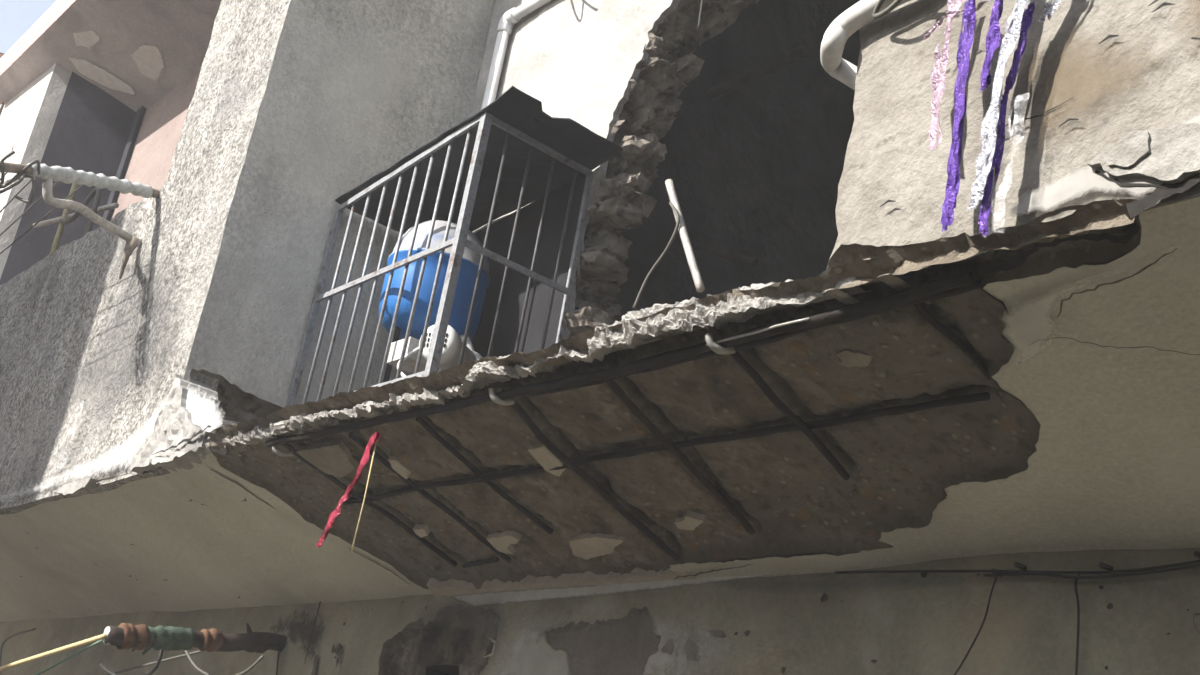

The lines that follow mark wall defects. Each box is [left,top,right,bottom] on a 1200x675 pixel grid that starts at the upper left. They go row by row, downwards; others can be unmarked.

peeling [68,30,135,96]
crack [1094,170,1200,218]
spalling [130,0,1142,589]
crack [1028,248,1200,355]
spalling [378,575,762,675]